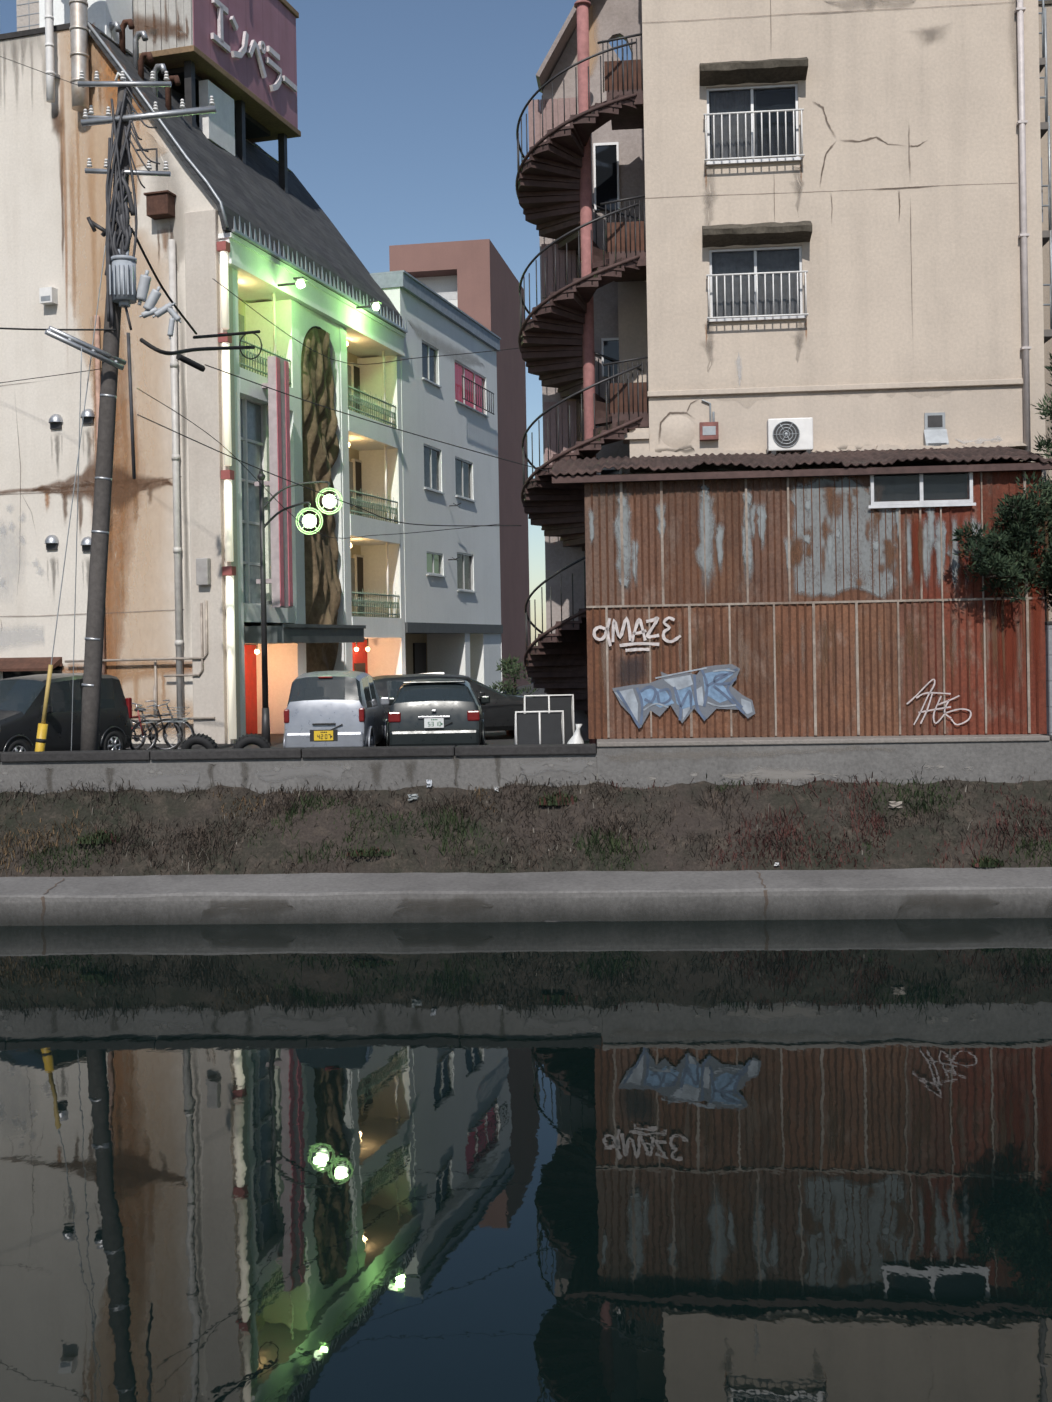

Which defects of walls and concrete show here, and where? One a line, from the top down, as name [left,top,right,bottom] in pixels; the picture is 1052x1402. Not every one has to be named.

crack [659,103,1012,288]
corrosion [53,24,193,732]
crack [659,401,695,435]
corrosion [0,444,97,526]
peeling [615,497,631,586]
peeling [697,485,714,578]
peeling [743,492,752,573]
peeling [790,477,968,597]
corrosion [912,522,923,580]
corrosion [982,519,1049,677]